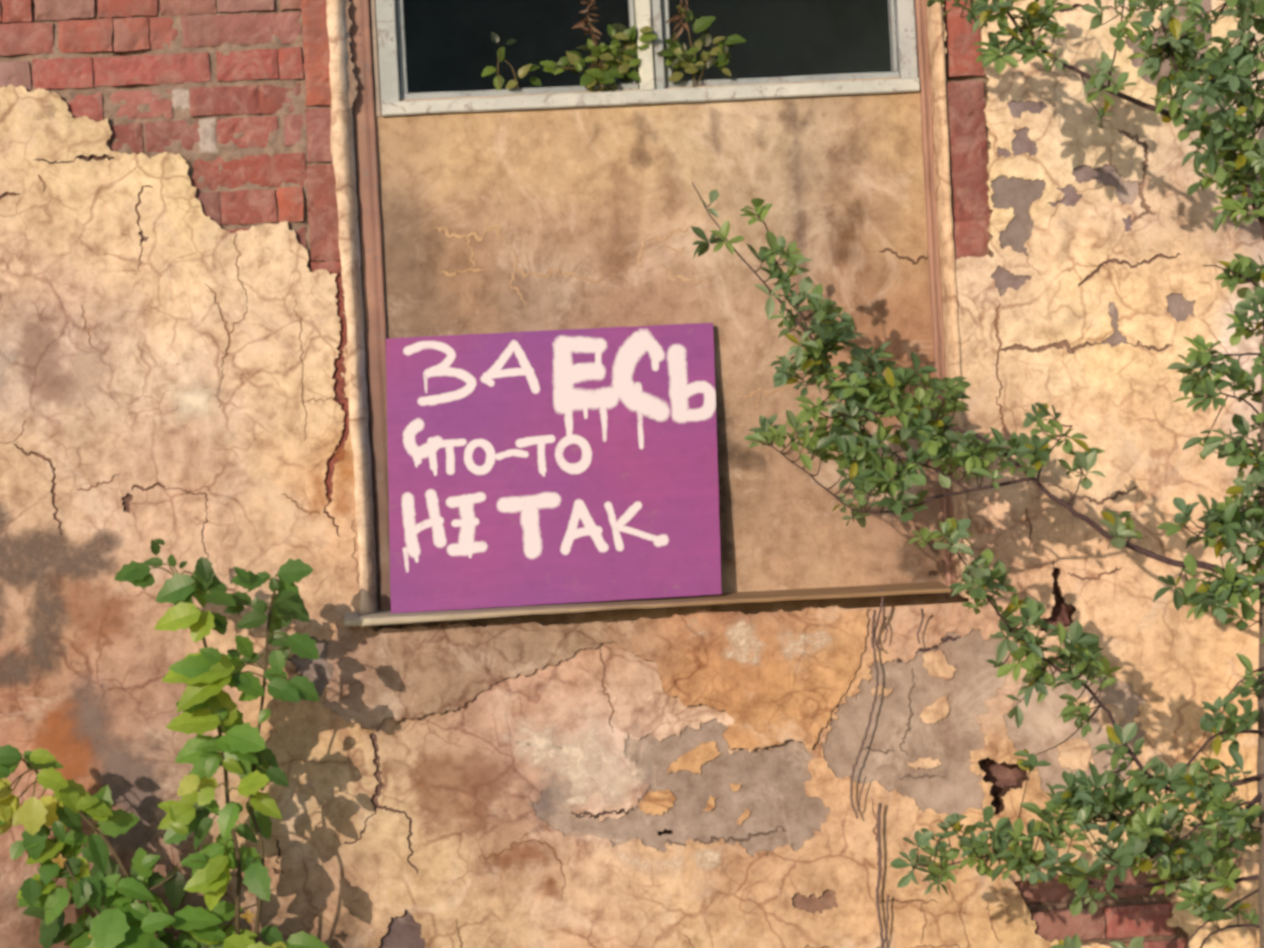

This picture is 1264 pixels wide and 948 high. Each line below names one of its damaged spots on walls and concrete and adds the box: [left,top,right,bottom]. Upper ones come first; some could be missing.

crack [0,154,115,199]
flaking render [0,0,342,276]
flaking render [942,0,1140,297]
crack [1078,253,1180,287]
crack [0,420,209,558]
crack [282,272,360,599]
leakage [0,511,116,684]
spalling [1040,561,1076,633]
flaking render [289,604,1147,857]
crack [343,733,419,873]
flaking render [378,910,426,948]
flaking render [1013,864,1189,948]